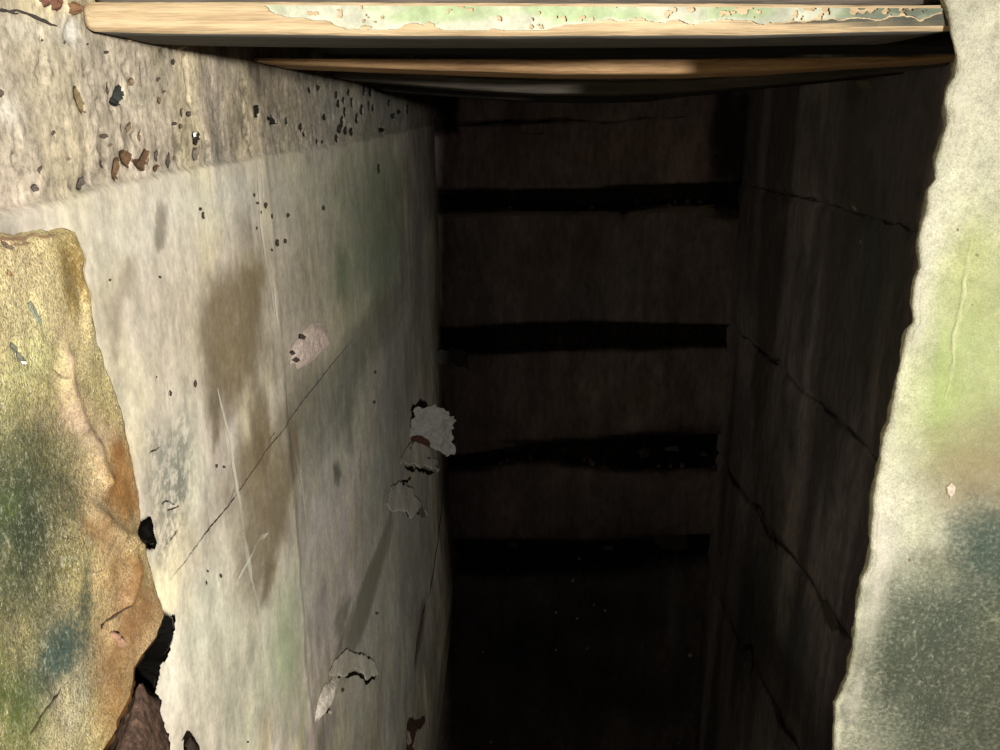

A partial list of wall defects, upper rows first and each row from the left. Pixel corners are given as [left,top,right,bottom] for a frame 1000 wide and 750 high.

peeling [266,5,943,30]
water stain [209,268,263,405]
spalling [289,322,330,369]
crack [162,340,353,578]
water stain [239,398,292,579]
flaking render [386,481,428,519]
flaking render [400,404,456,472]
flaking render [314,648,378,724]